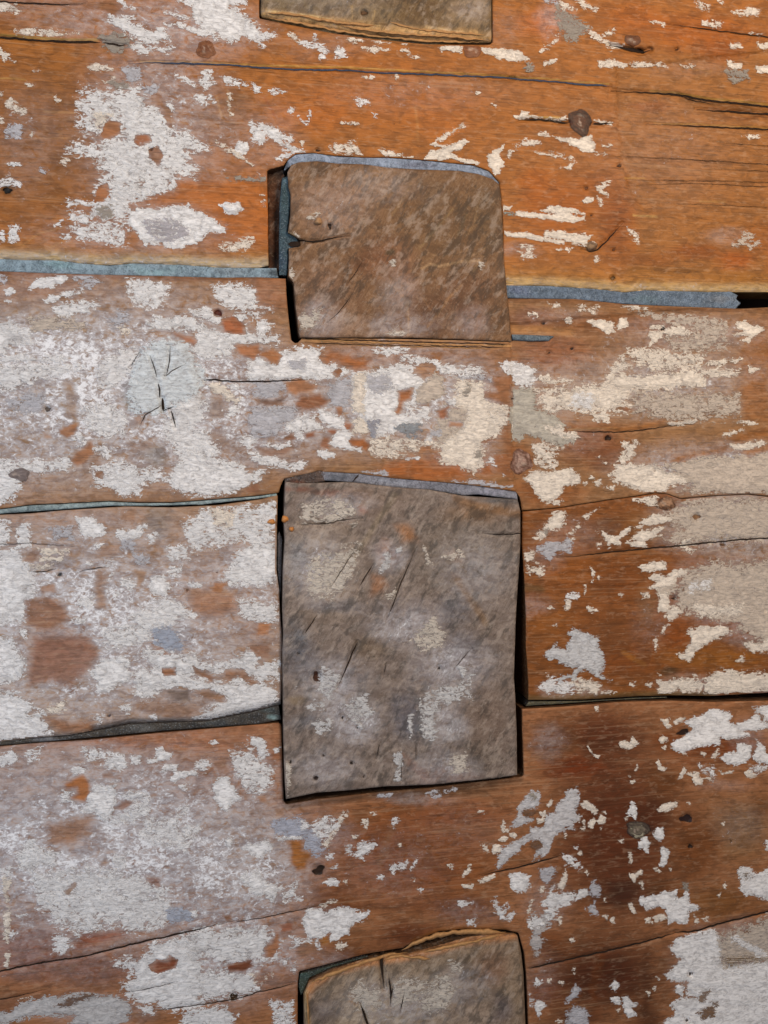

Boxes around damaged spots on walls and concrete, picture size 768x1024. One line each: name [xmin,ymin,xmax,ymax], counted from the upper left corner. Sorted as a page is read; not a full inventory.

peeling [481,0,667,72]
peeling [53,0,419,253]
peeling [378,110,613,175]
peeling [503,180,611,263]
crack [131,353,183,427]
peeling [0,274,768,769]
peeling [56,736,293,853]
peeling [656,705,768,786]
peeling [0,810,378,1024]
peeling [447,788,615,957]
peeling [618,801,768,1024]
peeling [529,968,590,1024]